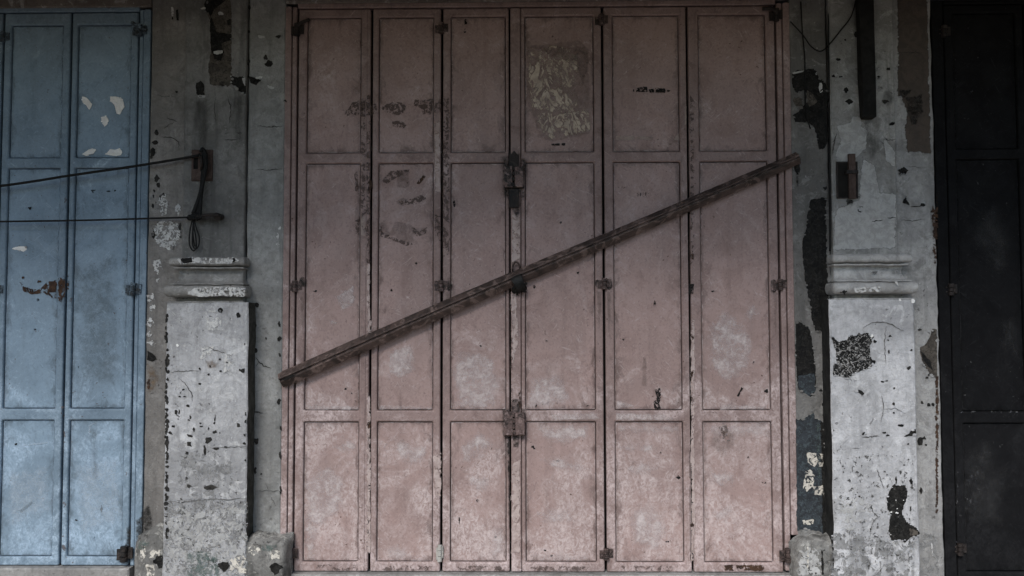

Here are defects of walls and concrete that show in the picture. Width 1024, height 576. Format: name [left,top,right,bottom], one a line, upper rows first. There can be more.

flaking render [195,0,275,98]
peeling [139,174,283,576]
peeling [791,0,939,576]